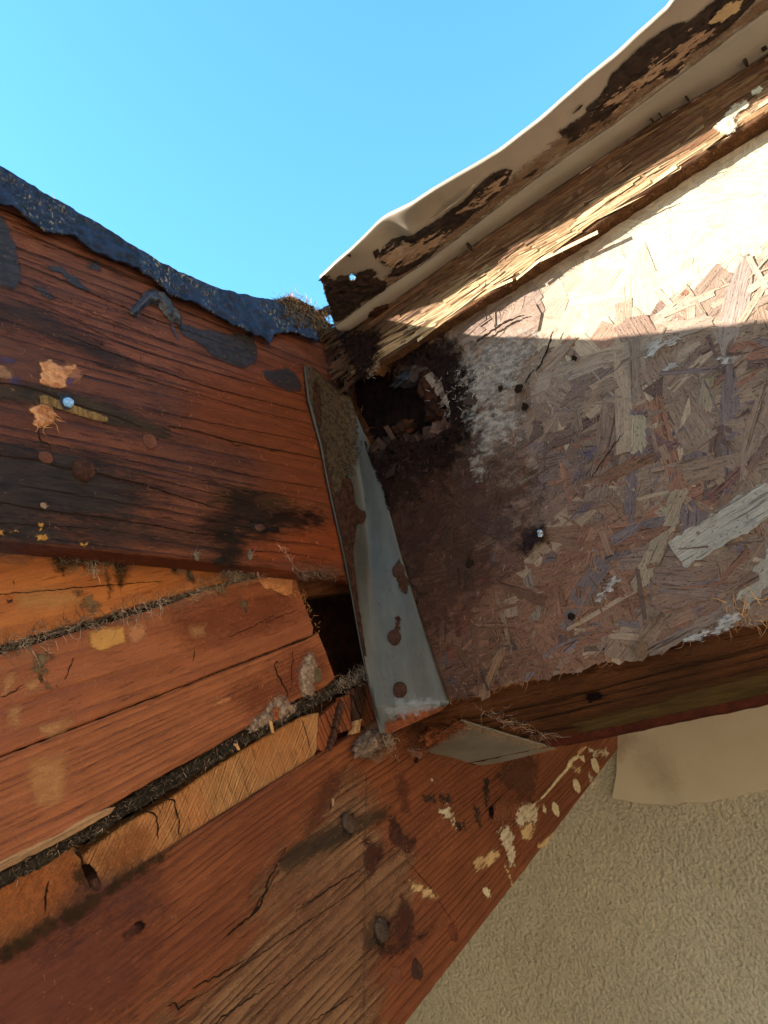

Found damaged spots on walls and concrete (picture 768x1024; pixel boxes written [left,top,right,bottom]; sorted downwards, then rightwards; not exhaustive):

peeling [39,359,82,389]
crack [525,330,554,383]
peeling [29,401,66,433]
water stain [386,330,539,641]
peeling [577,746,609,788]
peeling [496,802,539,868]
crack [227,847,287,936]
crack [167,870,366,1024]